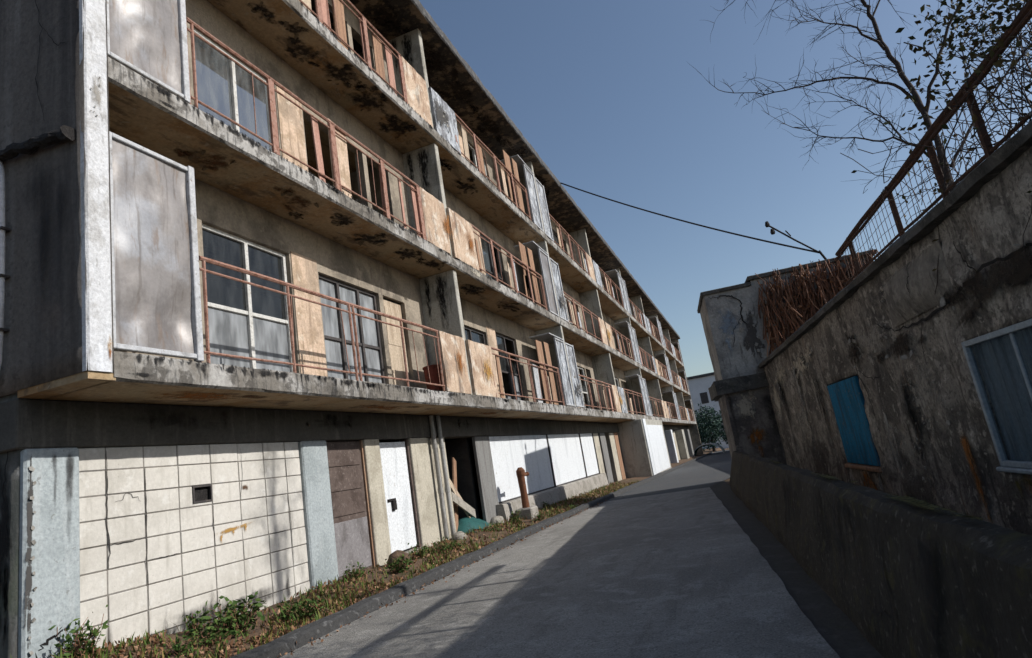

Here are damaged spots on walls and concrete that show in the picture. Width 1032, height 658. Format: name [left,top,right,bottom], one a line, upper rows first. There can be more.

damp [301,2,461,155]
crack [710,295,755,356]
crack [877,241,1032,365]
spalling [940,242,1032,327]
damp [53,456,73,491]
damp [0,463,11,635]